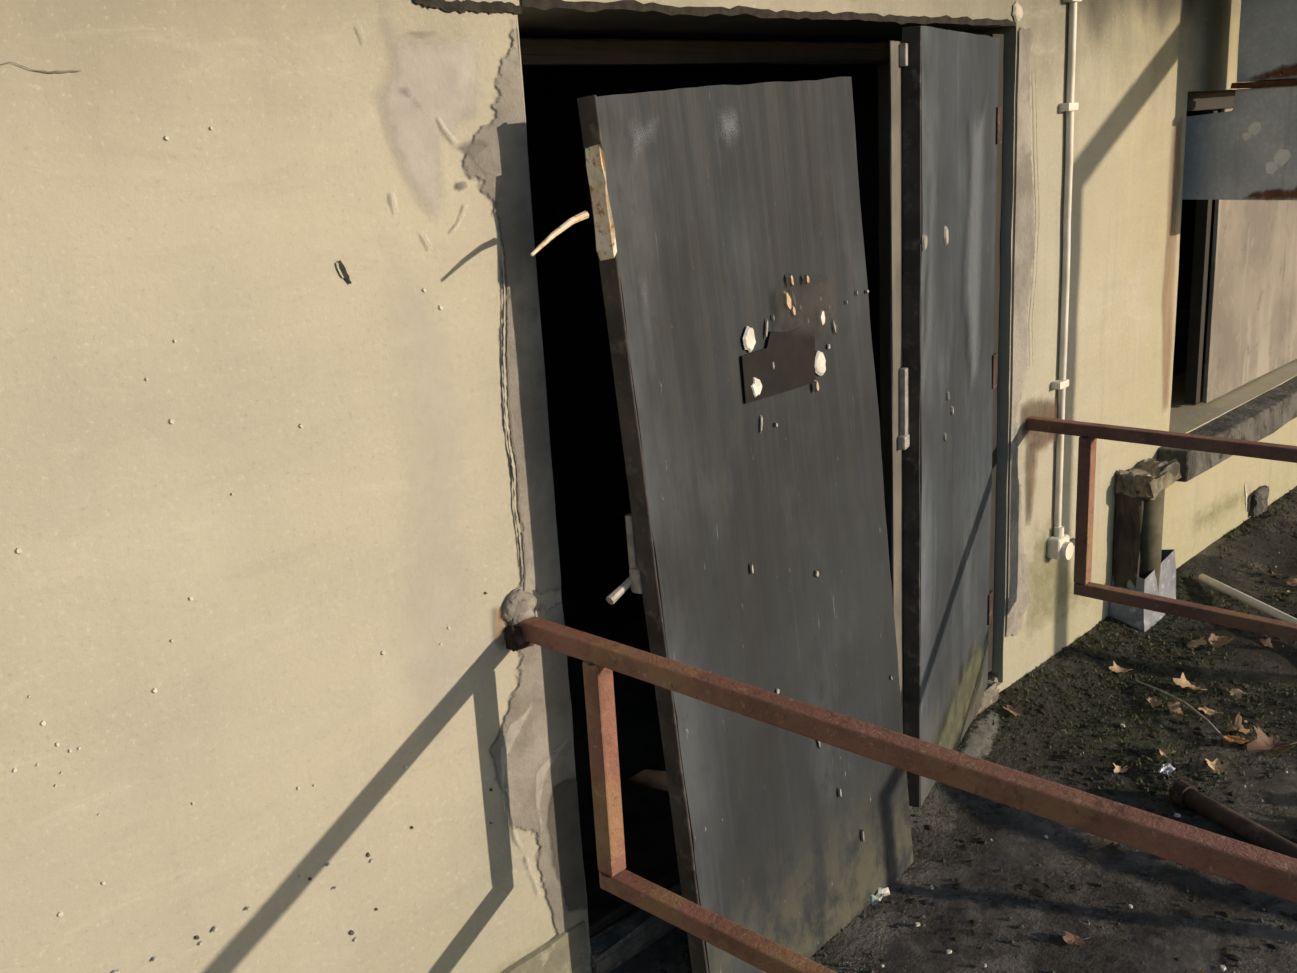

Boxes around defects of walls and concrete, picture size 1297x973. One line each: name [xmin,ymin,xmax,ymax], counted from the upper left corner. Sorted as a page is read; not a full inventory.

crack [414,0,522,14]
crack [0,62,81,73]
rust [1254,64,1297,79]
rust [1249,188,1297,200]
crack [502,249,526,592]
spalling [496,589,537,652]
peeling [490,709,529,791]
peeling [536,740,568,821]